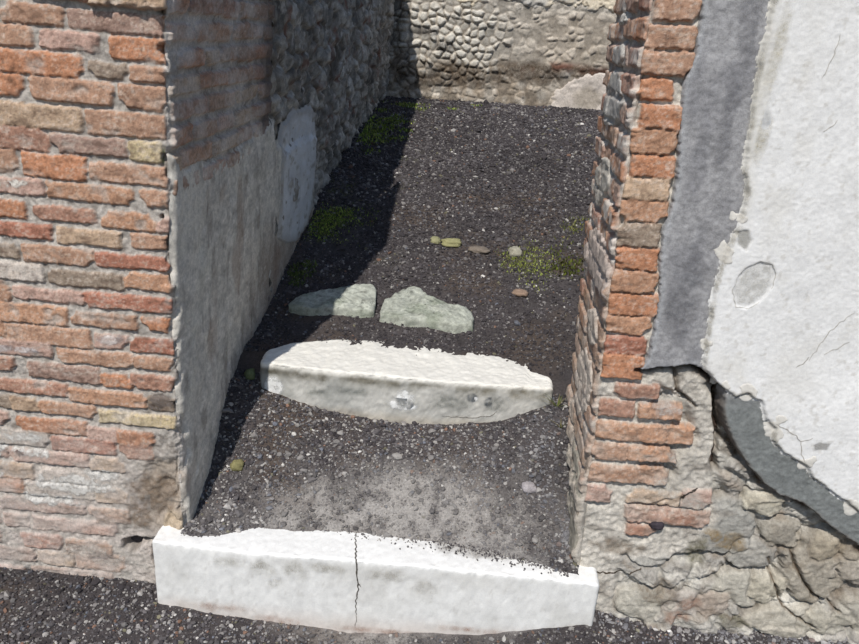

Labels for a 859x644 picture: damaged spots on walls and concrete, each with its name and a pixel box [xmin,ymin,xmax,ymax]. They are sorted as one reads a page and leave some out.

flaking render [503,0,616,13]
flaking render [713,211,749,288]
flaking render [700,308,714,353]
crack [797,313,854,367]
flaking render [675,364,758,401]
flaking render [763,415,788,448]
flaking render [797,443,829,483]
flaking render [843,499,859,516]
crack [353,532,361,622]
crack [767,559,811,625]
crack [789,548,837,609]